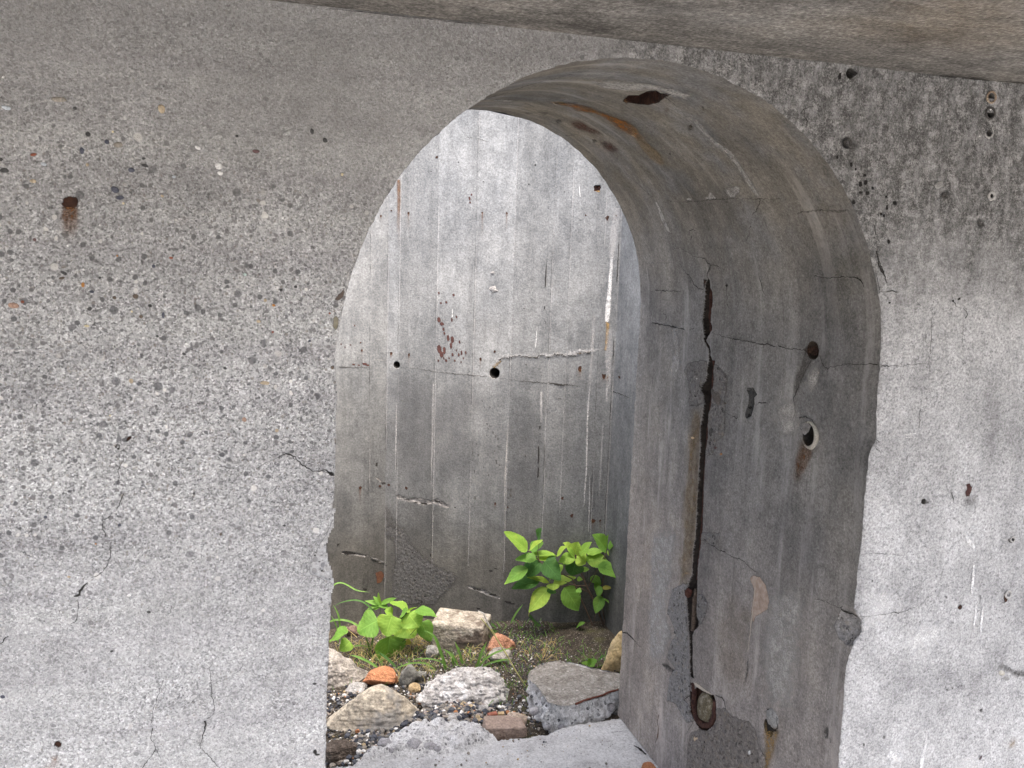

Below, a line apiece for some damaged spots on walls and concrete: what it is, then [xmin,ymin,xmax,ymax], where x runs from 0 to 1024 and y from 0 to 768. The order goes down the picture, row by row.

spalling [615,87,683,109]
rust [553,102,657,159]
rust [62,196,78,228]
crack [493,349,593,368]
crack [221,453,335,476]
crack [655,229,756,691]
crack [71,455,124,624]
spalling [660,583,767,768]